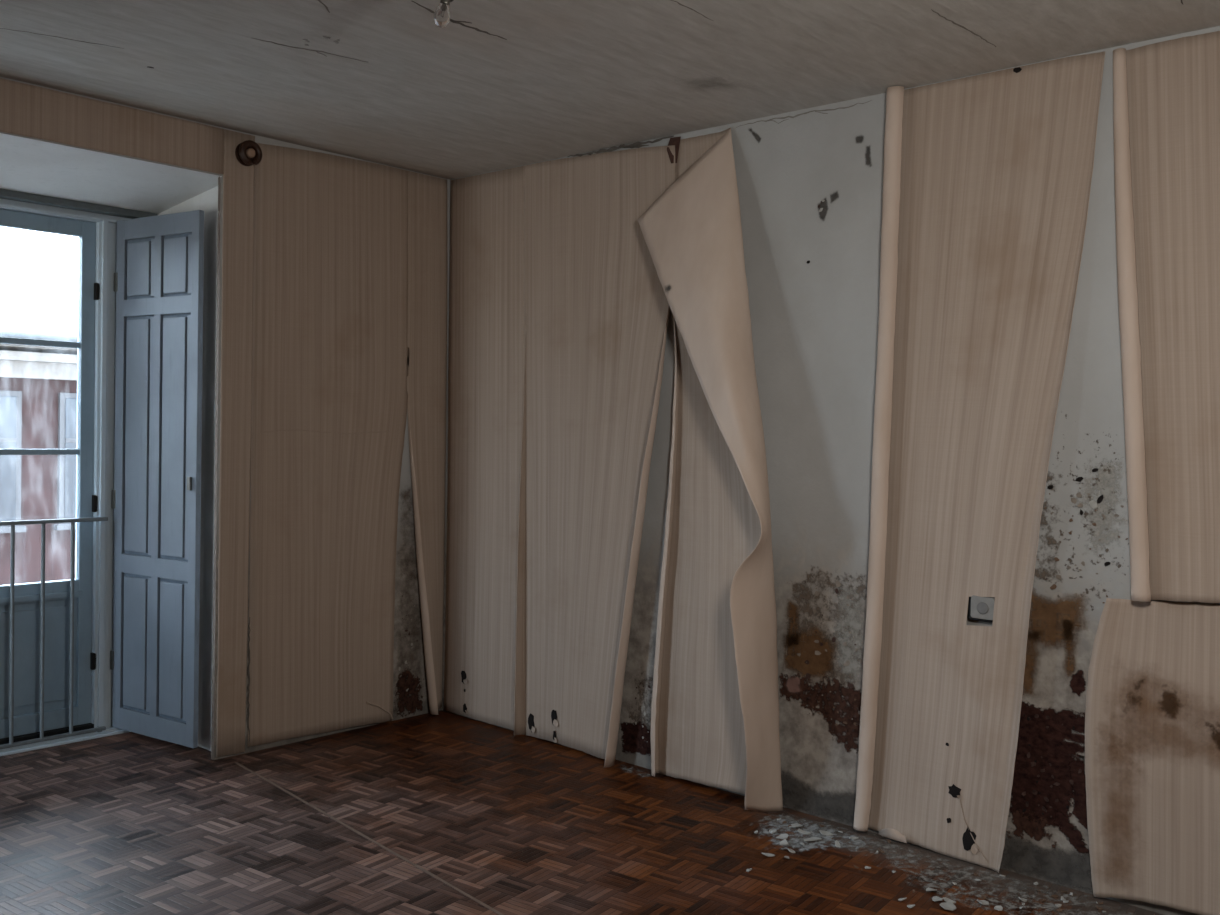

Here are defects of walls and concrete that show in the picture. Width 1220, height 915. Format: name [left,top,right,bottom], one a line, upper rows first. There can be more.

crack [253,38,366,62]
crack [412,1,507,40]
peeling [1034,434,1129,611]
water stain [394,549,423,717]
water stain [784,602,835,677]
water stain [1006,592,1089,854]
water stain [1132,680,1179,718]
water stain [1206,723,1220,749]